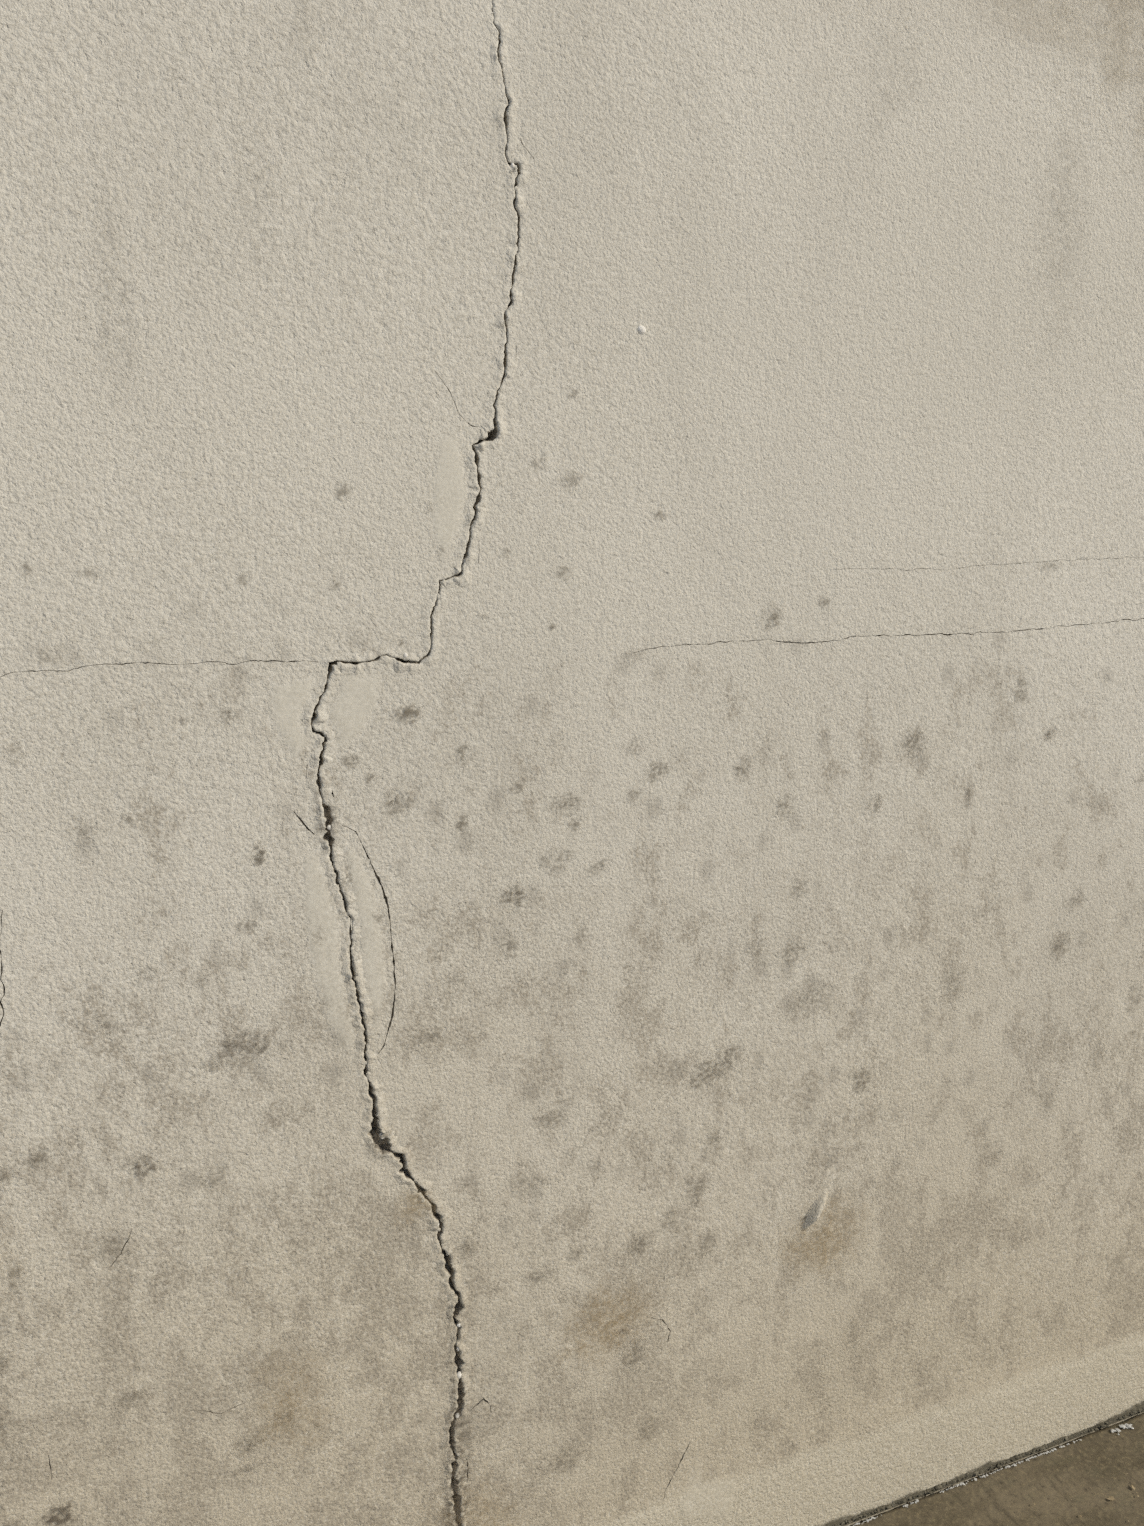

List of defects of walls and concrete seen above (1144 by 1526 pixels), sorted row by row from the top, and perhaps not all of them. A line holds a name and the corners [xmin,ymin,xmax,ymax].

crack [634,618,1144,653]
crack [0,0,534,1526]
damp [44,1505,74,1524]
damp [825,1403,1144,1526]